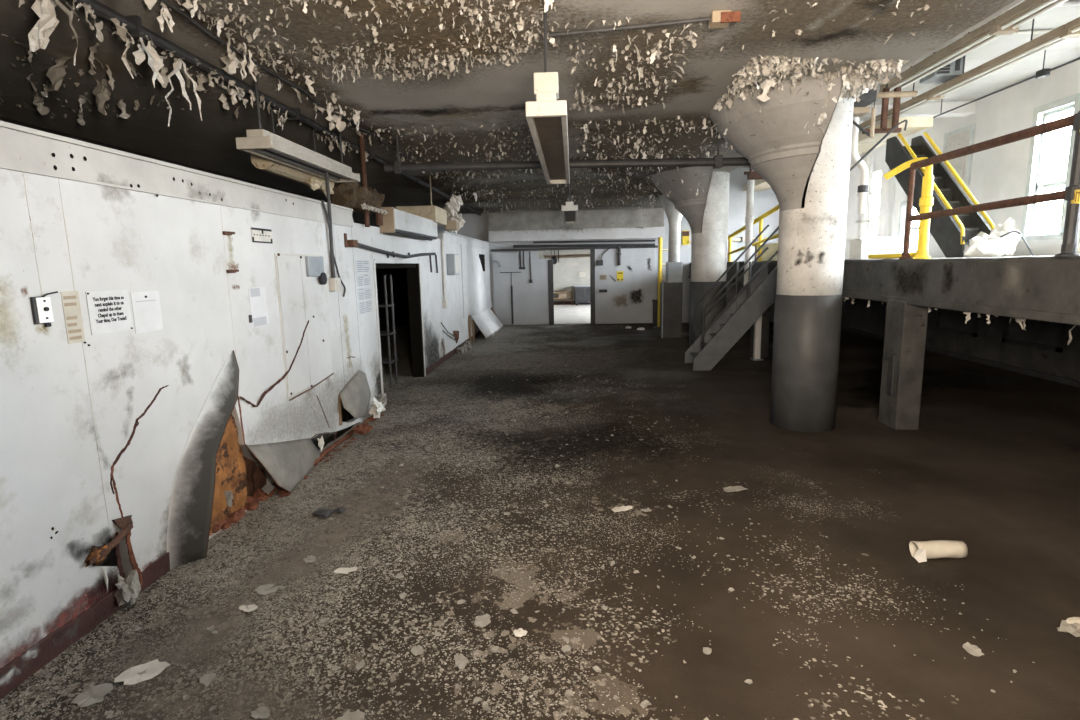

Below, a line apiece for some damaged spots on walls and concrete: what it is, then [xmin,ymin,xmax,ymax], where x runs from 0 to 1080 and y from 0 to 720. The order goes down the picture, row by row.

crack [240,320,309,407]
crack [110,385,169,518]
hole [243,456,267,497]